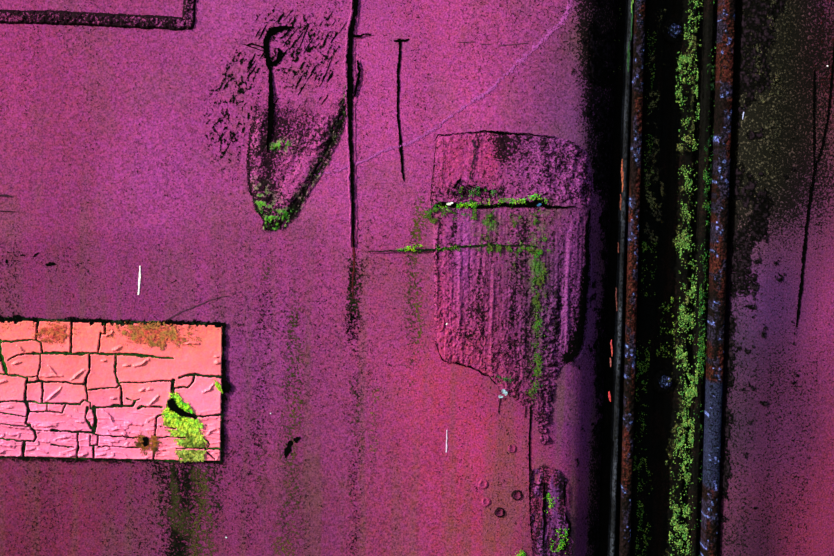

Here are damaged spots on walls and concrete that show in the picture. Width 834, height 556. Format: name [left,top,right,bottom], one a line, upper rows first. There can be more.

crack [0,318,225,463]
leakage [141,462,233,556]